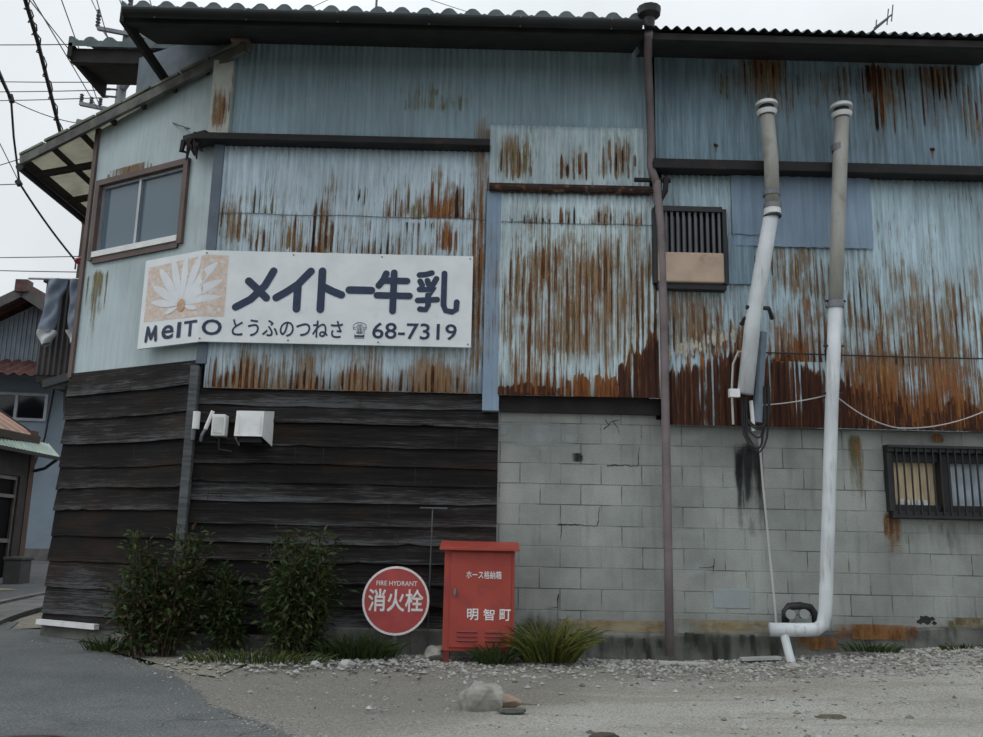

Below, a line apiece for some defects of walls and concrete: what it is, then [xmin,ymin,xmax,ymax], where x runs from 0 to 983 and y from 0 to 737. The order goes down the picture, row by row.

corrosion [212,93,230,126]
corrosion [714,59,798,106]
corrosion [810,63,983,138]
corrosion [500,135,532,180]
corrosion [603,140,636,180]
corrosion [85,271,108,323]
corrosion [208,152,829,428]
corrosion [838,260,983,477]
leakage [736,445,762,506]
corrosion [884,514,900,547]